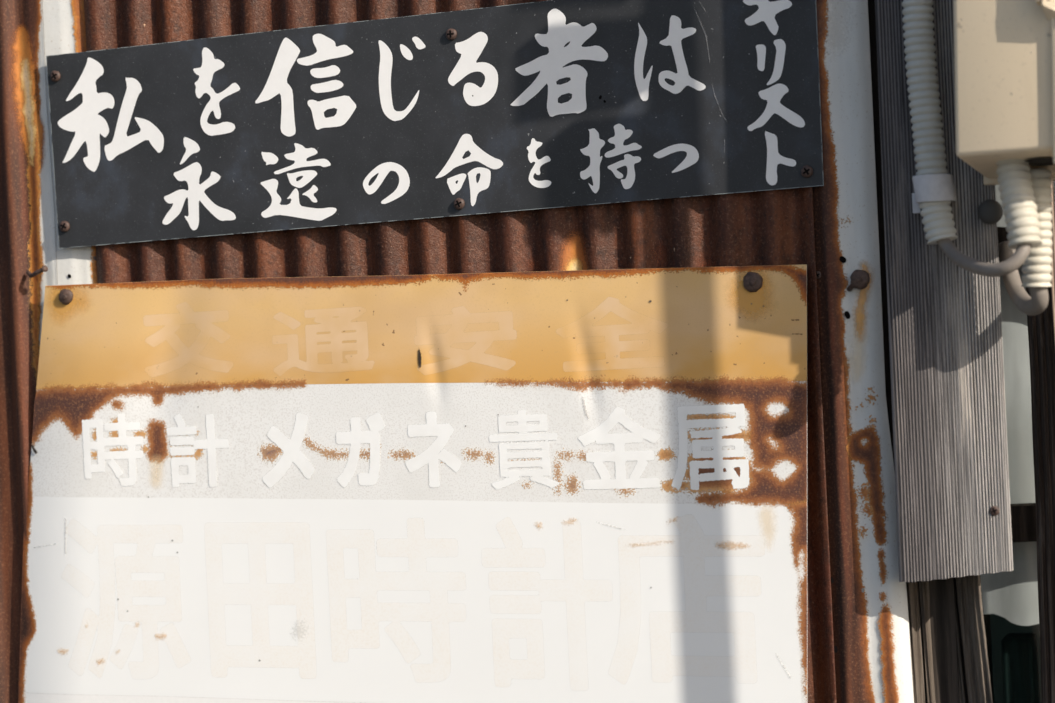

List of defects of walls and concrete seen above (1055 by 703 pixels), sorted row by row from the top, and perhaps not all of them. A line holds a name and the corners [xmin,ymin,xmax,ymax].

rust [0,0,807,703]
rust [812,0,899,703]